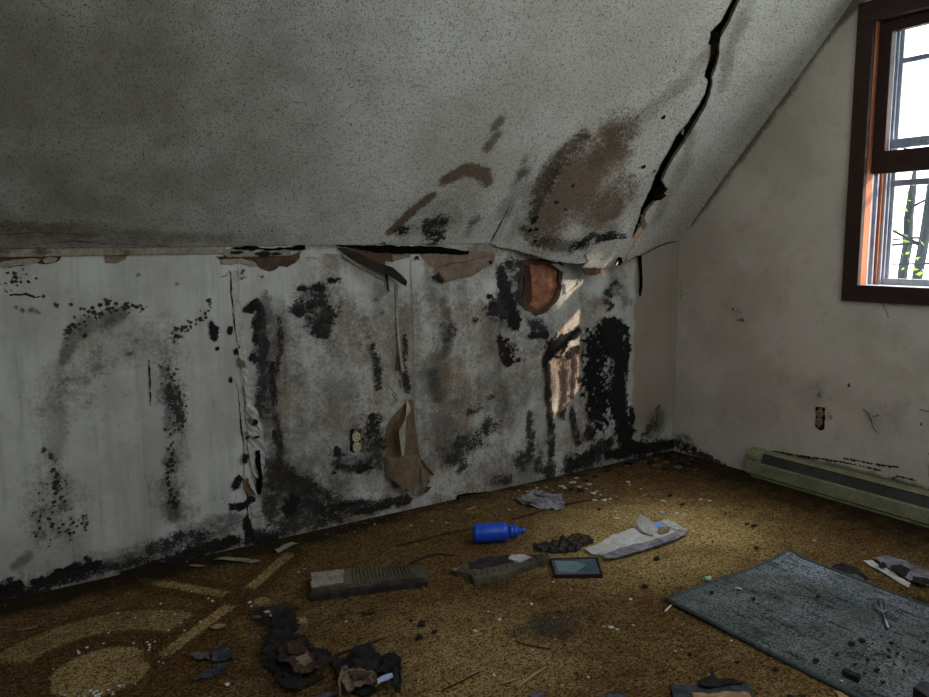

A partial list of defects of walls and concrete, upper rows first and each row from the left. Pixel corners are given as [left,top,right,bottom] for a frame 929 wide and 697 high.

damp [377,163,492,245]
damp [484,117,504,152]
damp [524,114,639,255]
crack [622,0,740,297]
mould [0,268,45,312]
spalling [217,245,495,284]
mould [440,297,459,353]
mould [472,257,727,487]
mould [0,277,413,602]
mould [439,393,502,475]